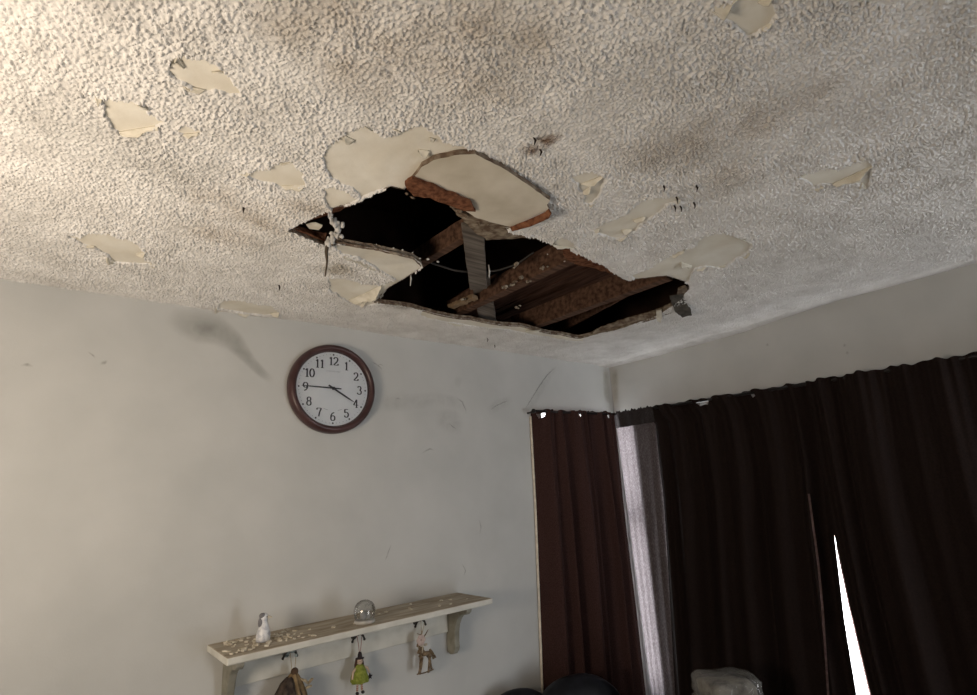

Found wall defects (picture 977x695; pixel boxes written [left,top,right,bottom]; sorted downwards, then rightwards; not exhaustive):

peeling [169,56,240,95]
peeling [323,125,466,208]
peeling [328,245,420,308]
peeling [551,238,576,250]
peeling [632,233,752,281]
peeling [421,310,584,346]